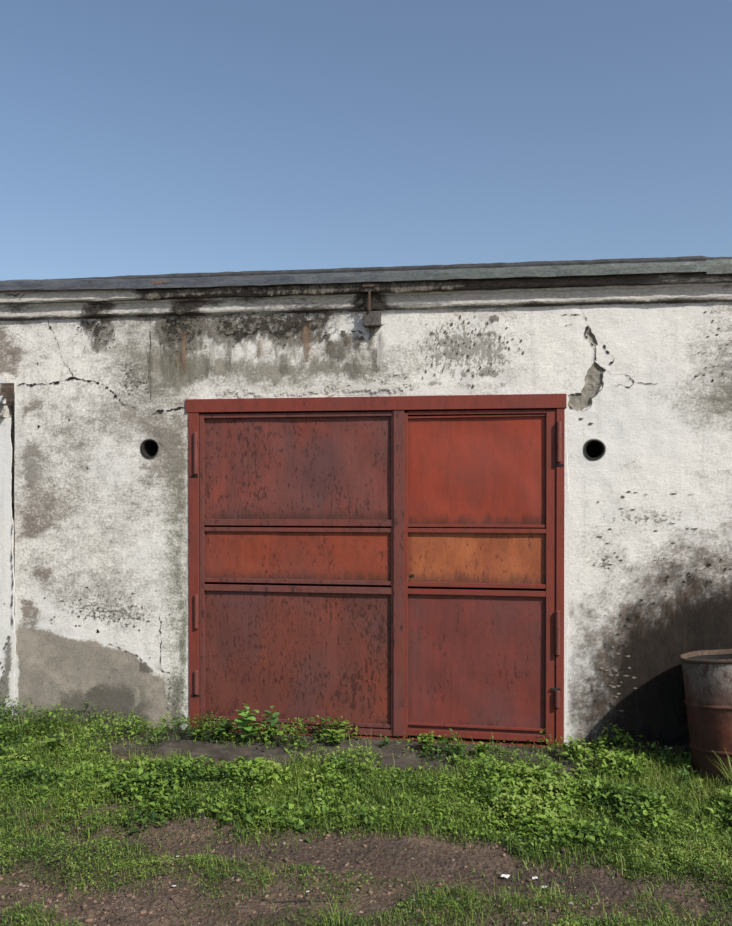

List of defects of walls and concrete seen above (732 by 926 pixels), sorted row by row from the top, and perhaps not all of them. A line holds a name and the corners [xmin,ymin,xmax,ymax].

leakage [75,303,116,351]
leakage [139,281,463,395]
spalling [567,362,606,425]
spalling [585,325,598,346]
crack [568,345,658,388]
crack [11,319,184,625]
peeling [593,491,697,571]
leakage [16,600,176,729]